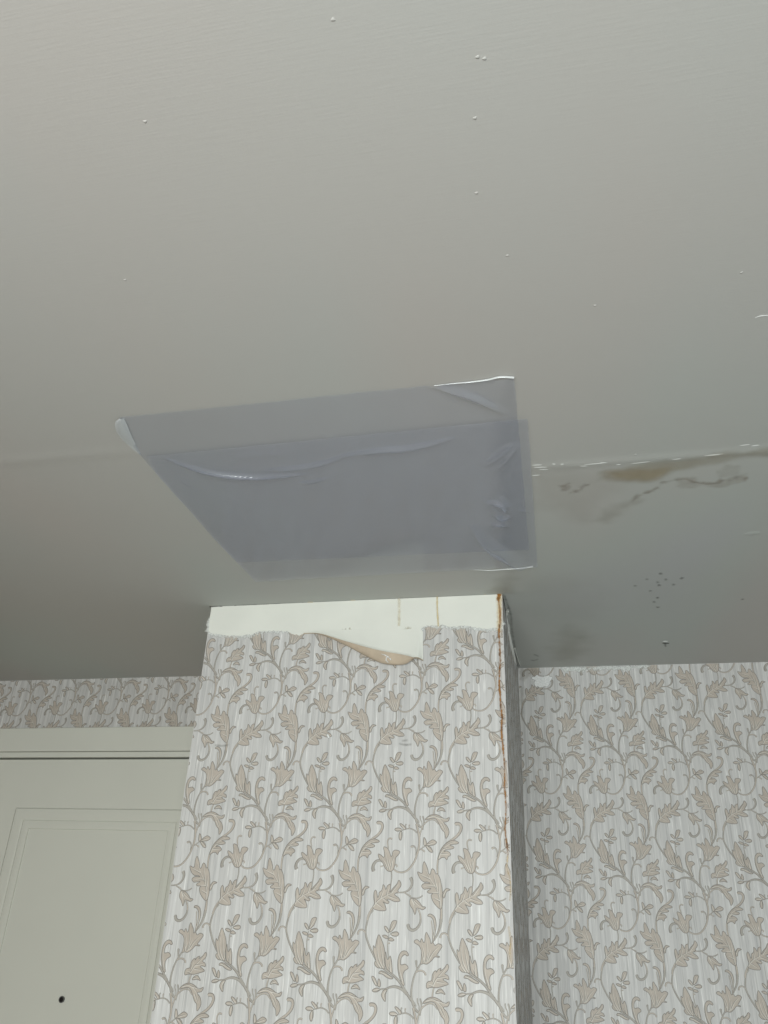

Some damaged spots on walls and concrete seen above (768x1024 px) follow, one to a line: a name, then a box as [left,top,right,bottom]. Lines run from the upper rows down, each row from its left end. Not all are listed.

corrosion [497,594,507,845]